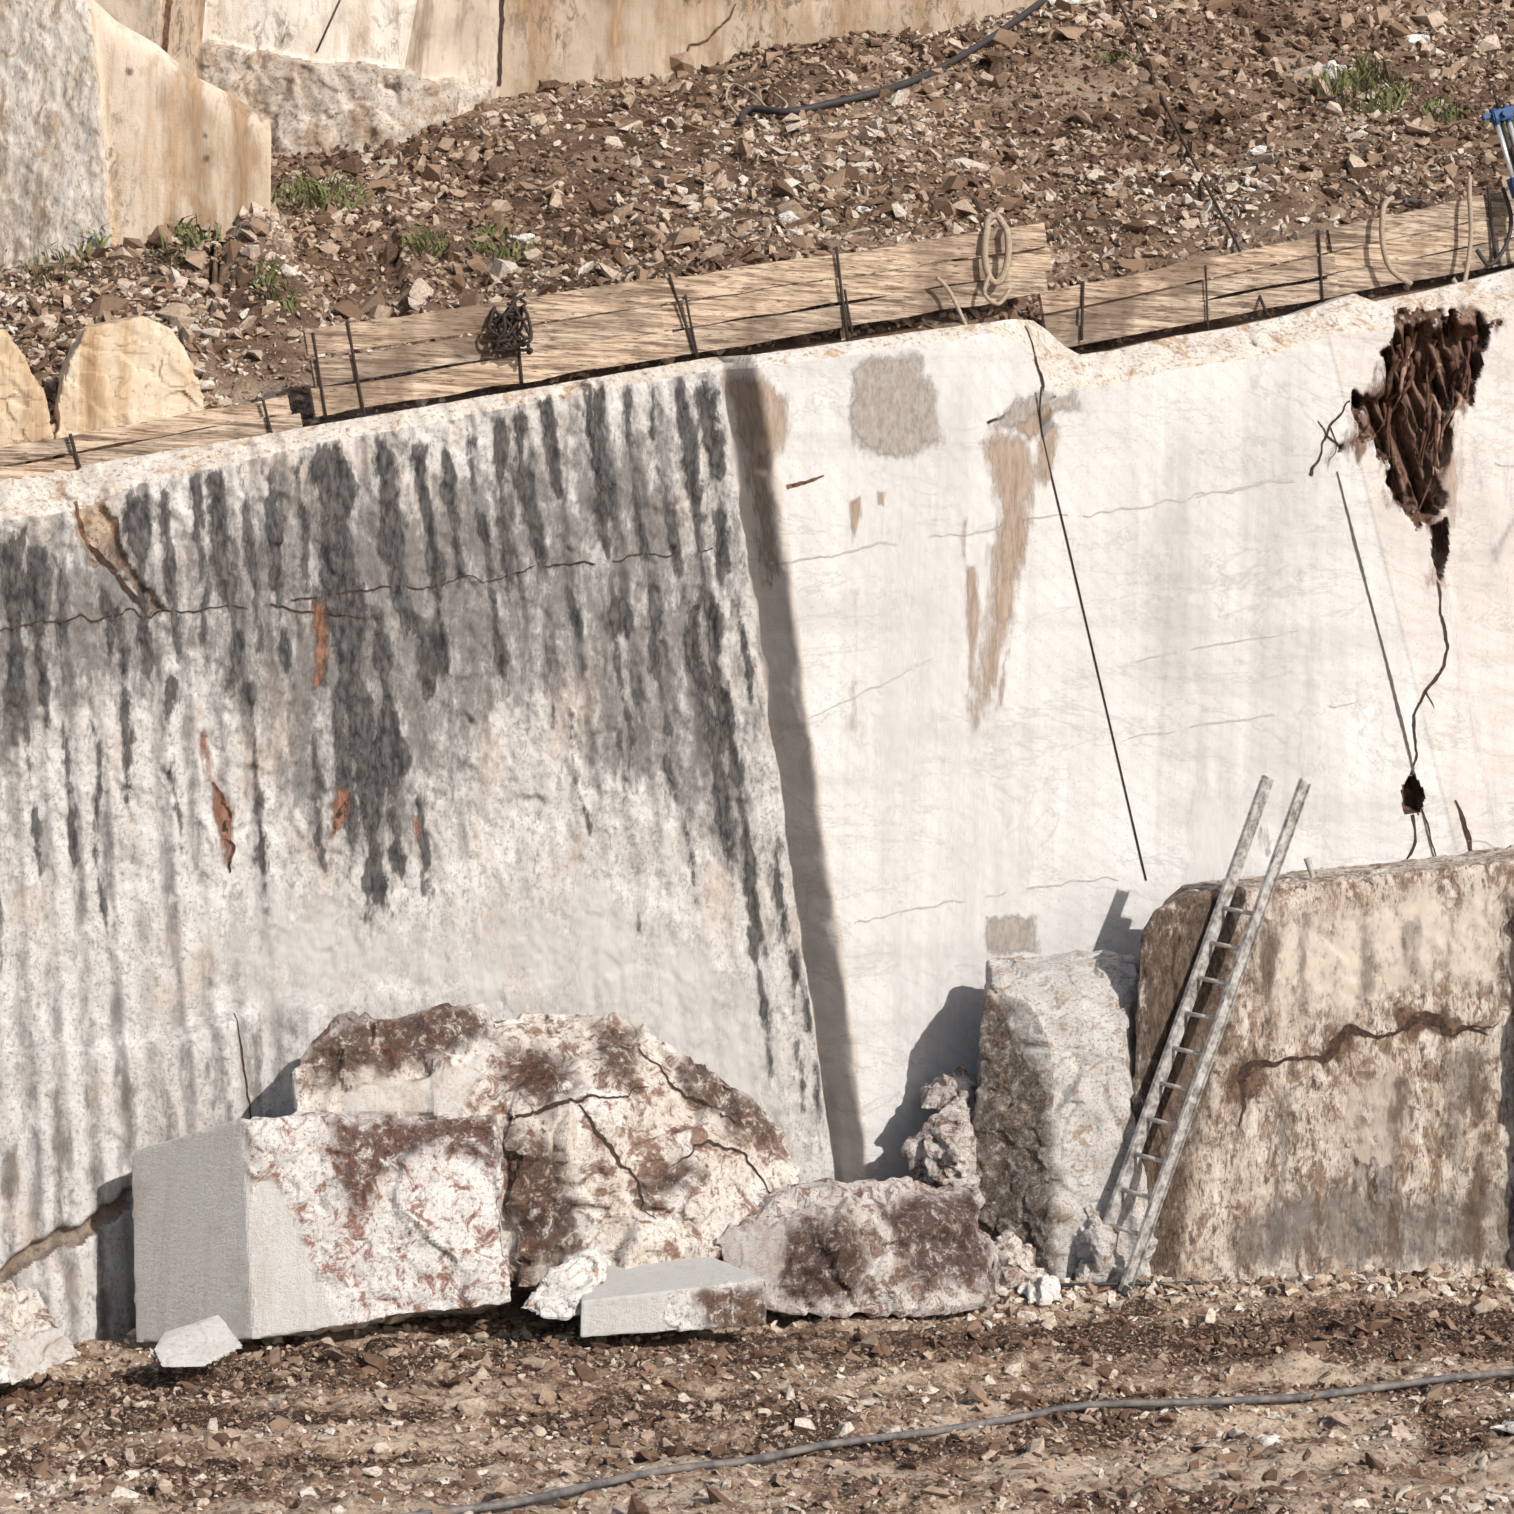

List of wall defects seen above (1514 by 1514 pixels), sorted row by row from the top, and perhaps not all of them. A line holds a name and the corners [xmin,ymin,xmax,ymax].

leakage [849,353,939,458]
leakage [967,406,1057,725]
spalling [1328,306,1503,586]
crack [1406,579,1497,859]
crack [1236,1011,1498,1127]